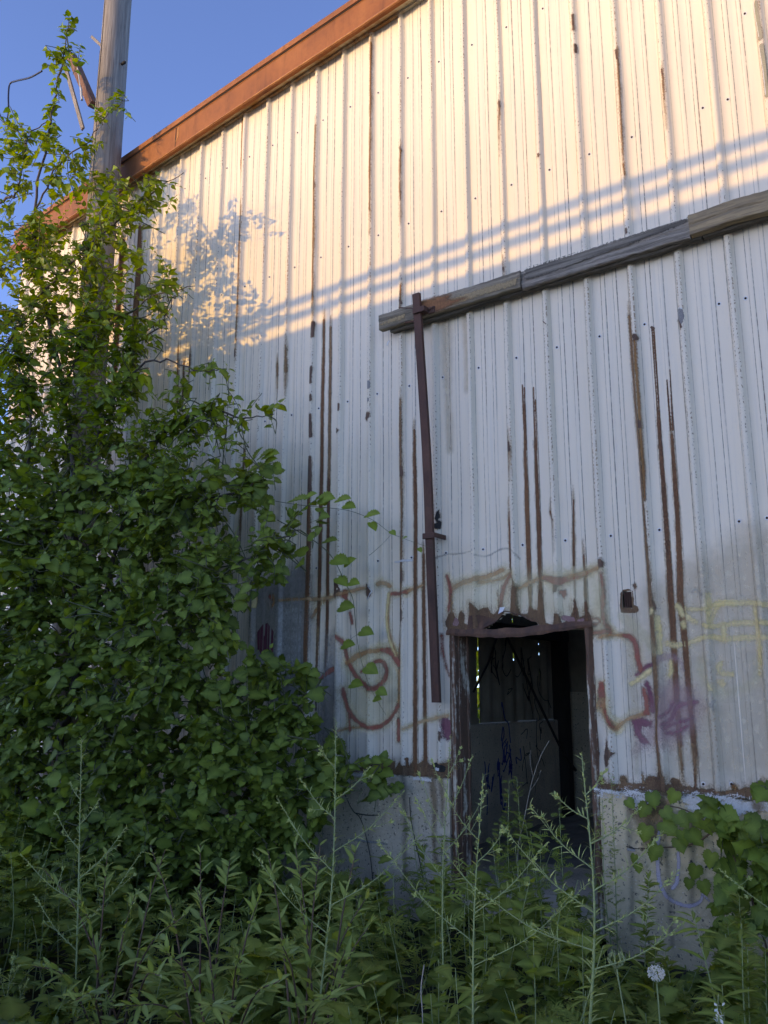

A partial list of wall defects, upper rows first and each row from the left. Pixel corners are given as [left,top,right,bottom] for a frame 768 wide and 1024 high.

rust [303,125,332,672]
rust [358,399,451,860]
rust [446,384,594,638]
rust [600,315,761,845]